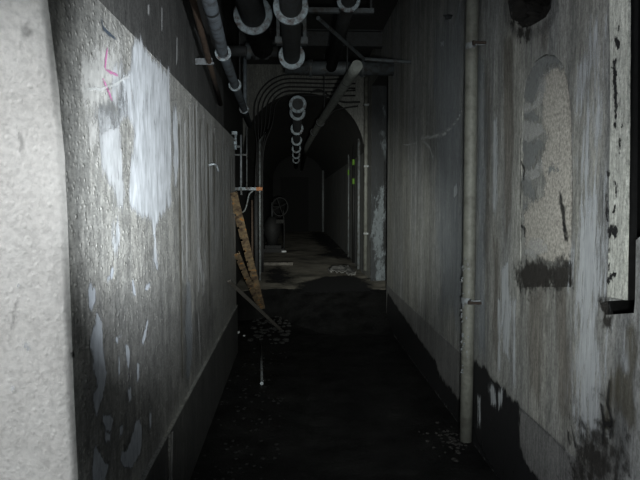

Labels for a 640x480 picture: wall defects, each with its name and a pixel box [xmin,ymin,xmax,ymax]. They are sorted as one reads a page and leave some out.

peeling [611,58,623,128]
water stain [516,63,630,480]
peeling [605,194,618,239]
peeling [88,283,113,441]
peeling [121,419,142,469]
water stain [387,294,460,425]
water stain [472,360,538,480]